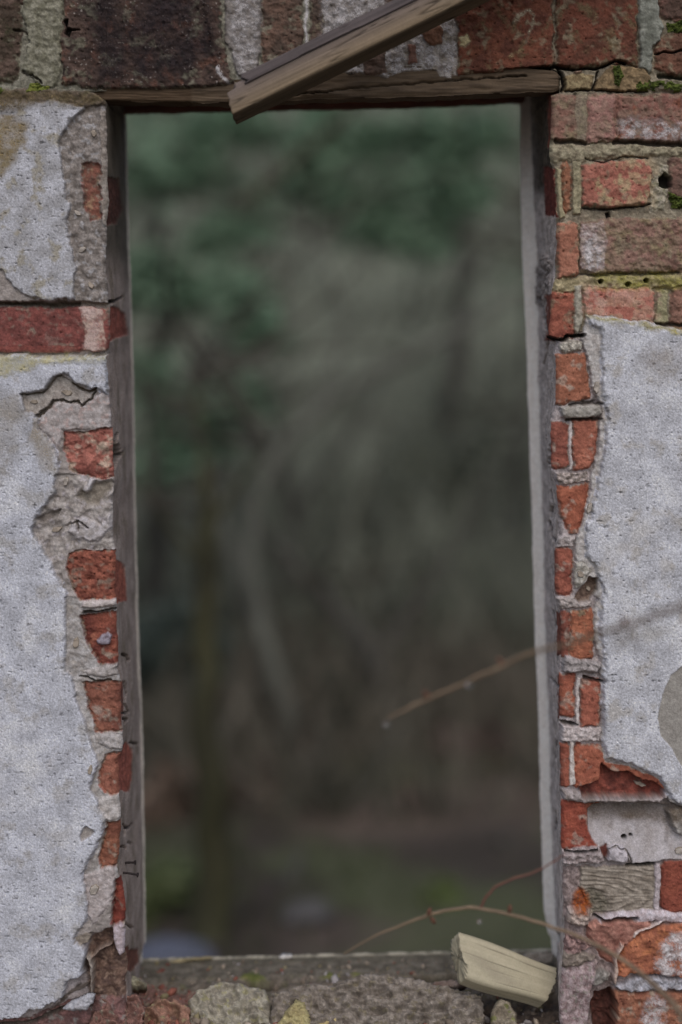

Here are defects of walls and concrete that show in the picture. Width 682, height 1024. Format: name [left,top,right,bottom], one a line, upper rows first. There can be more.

crack [530,60,648,93]
crack [21,374,97,418]
spalling [33,433,128,999]
spalling [573,315,682,863]